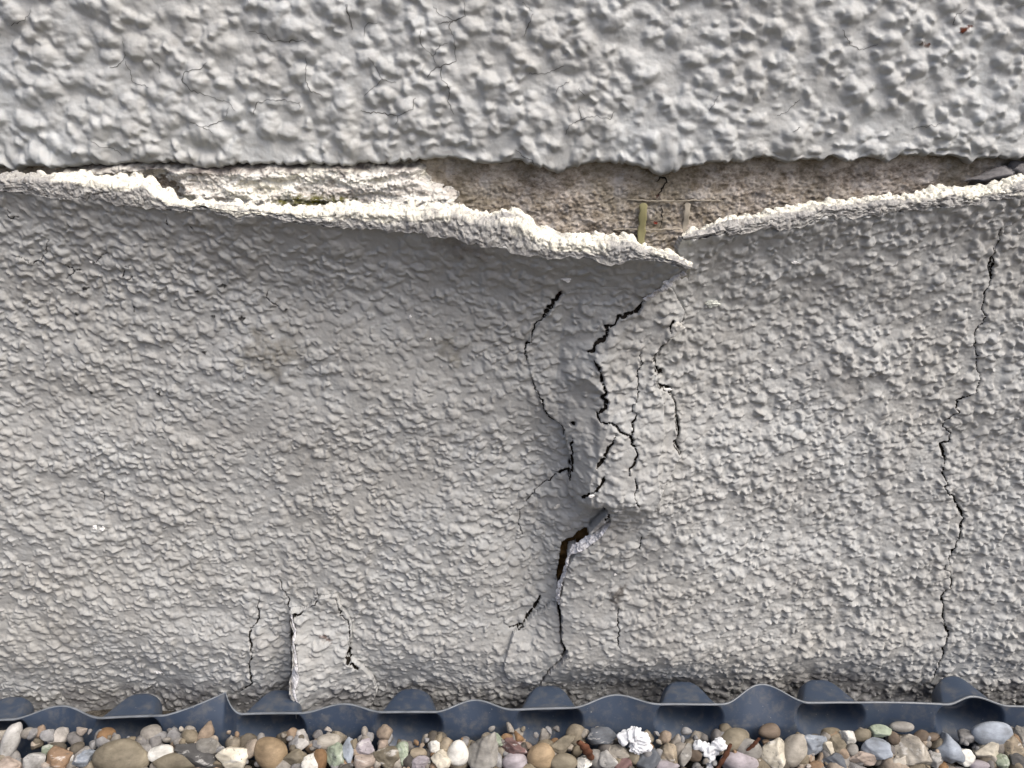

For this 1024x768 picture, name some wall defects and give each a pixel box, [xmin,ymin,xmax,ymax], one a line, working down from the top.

peeling [0,155,1024,719]
crack [518,291,681,531]
crack [934,227,1003,676]
crack [241,601,260,691]
crack [281,582,359,670]
crack [509,574,566,652]